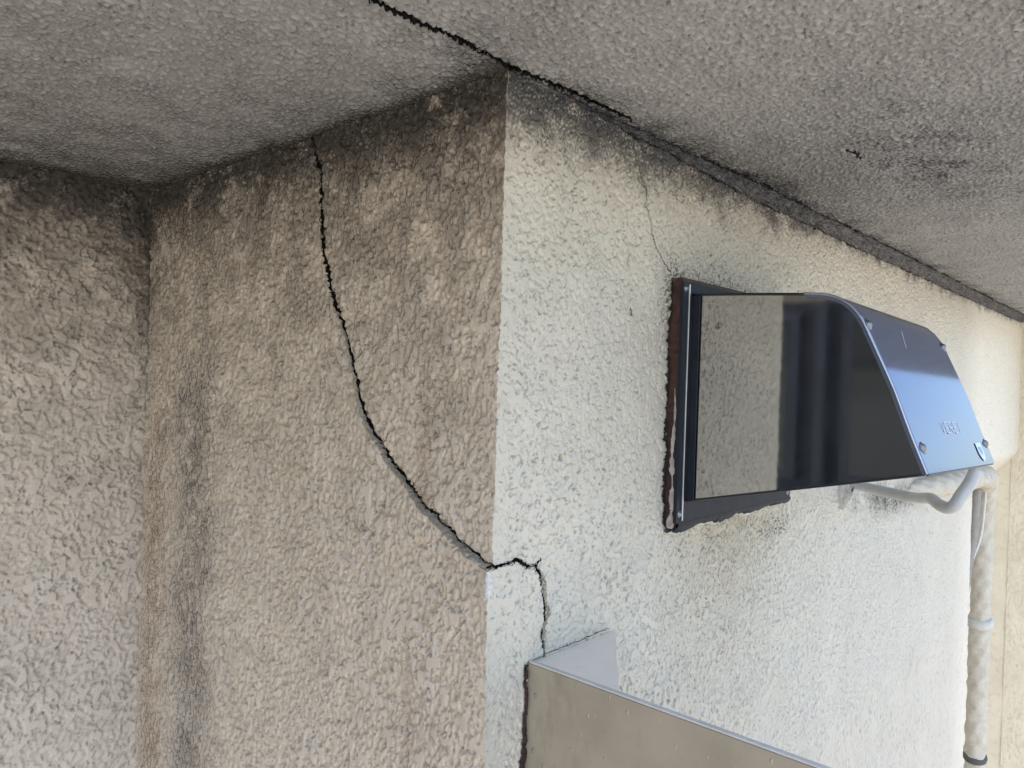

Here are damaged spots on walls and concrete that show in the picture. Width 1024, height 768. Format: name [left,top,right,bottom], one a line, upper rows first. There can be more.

damp [0,64,968,323]
crack [369,0,672,273]
crack [311,137,551,656]